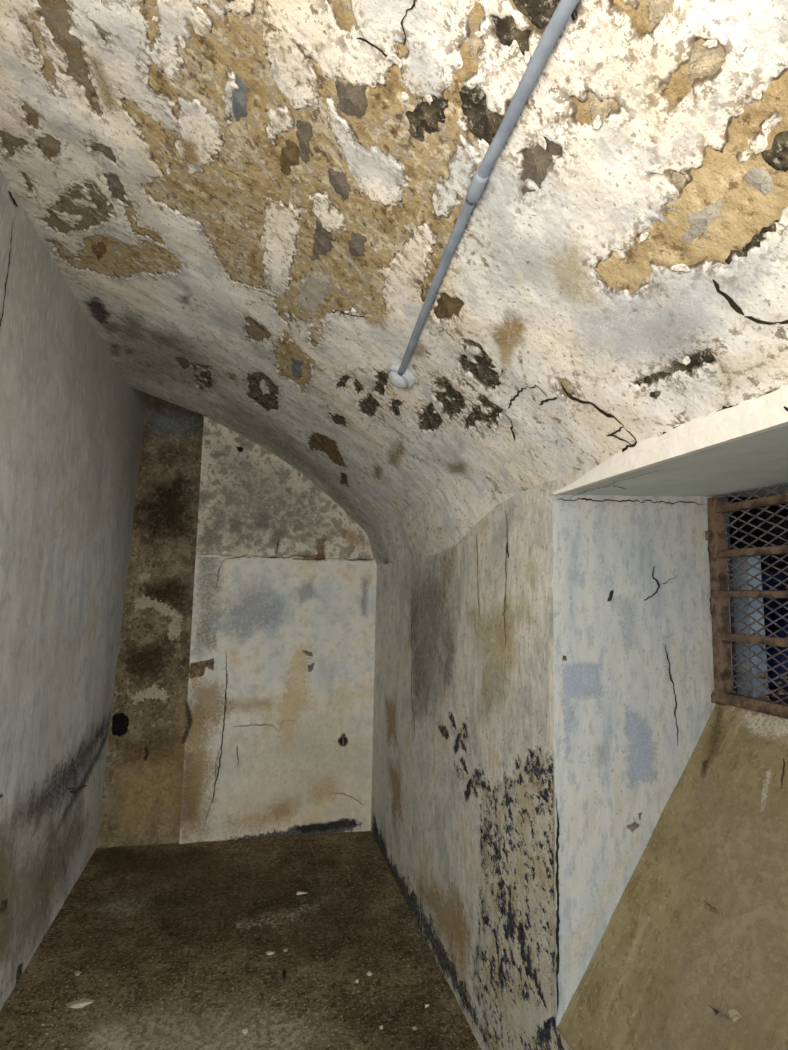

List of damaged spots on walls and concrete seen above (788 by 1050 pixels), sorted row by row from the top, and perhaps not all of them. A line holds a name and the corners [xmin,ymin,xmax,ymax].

flaking render [26,0,102,114]
crack [356,0,415,57]
flaking render [44,144,183,279]
flaking render [120,0,562,417]
flaking render [594,70,788,296]
crack [712,279,788,325]
peeling [418,340,504,431]
crack [503,382,680,452]
damp [139,580,187,608]
crack [665,645,679,745]
damp [118,680,230,838]
damp [647,709,788,1050]